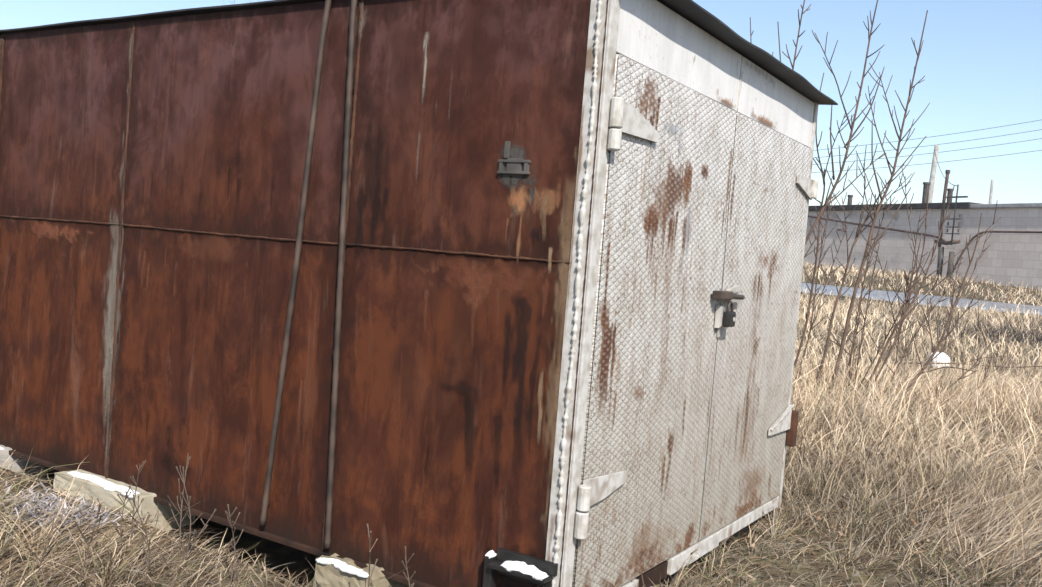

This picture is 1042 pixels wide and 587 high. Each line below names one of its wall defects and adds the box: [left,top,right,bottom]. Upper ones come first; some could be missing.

rust [641,80,661,130]
rust [16,221,99,257]
rust [644,162,708,262]
rust [417,258,548,336]
rust [599,242,617,425]
rust [737,477,771,518]